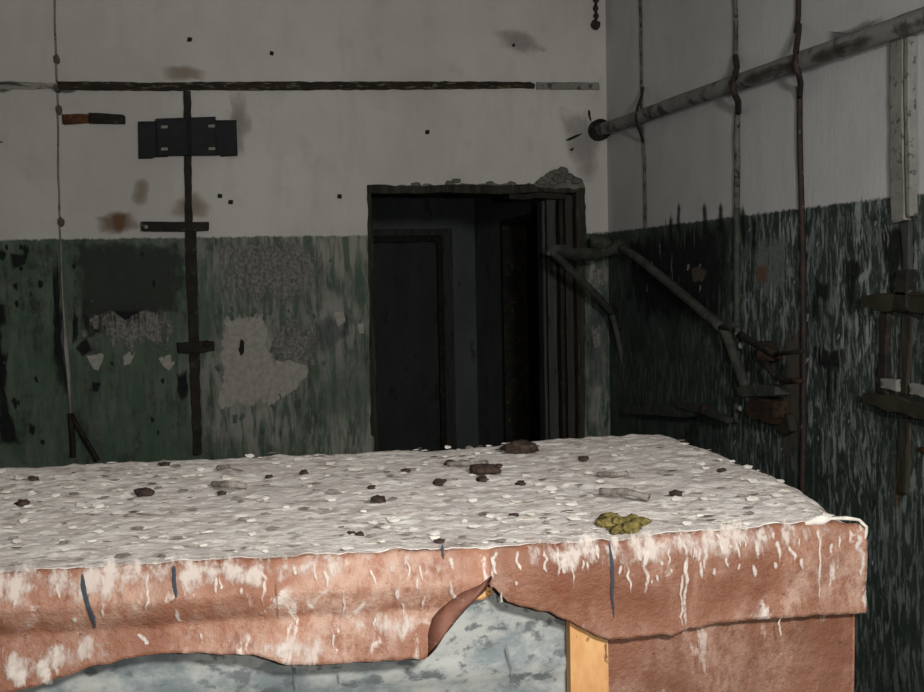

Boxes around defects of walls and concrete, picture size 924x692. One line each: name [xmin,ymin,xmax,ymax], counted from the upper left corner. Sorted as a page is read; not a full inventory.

peeling [0,299,20,443]
peeling [0,245,29,271]
peeling [30,270,67,387]
rust [105,215,128,230]
peeling [73,309,188,398]
peeling [214,307,325,423]
flaking render [357,193,374,436]
flaking render [445,167,587,247]
peeling [0,418,810,566]